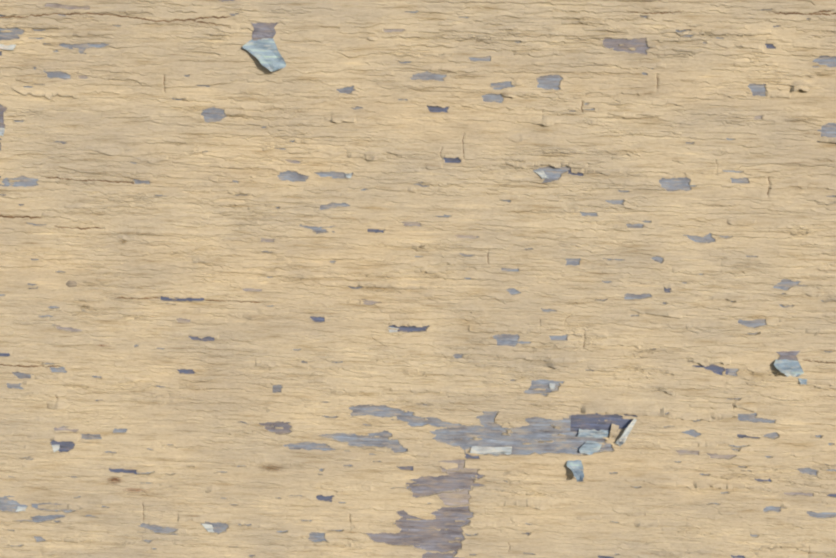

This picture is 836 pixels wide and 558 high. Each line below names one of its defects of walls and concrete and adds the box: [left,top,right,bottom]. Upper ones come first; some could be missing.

peeling [0,28,24,55]
peeling [243,22,308,77]
peeling [603,37,651,55]
peeling [43,70,88,80]
peeling [506,155,588,183]
peeling [2,176,39,187]
peeling [774,350,807,385]
peeling [524,379,564,395]
peeling [259,421,300,434]
peeling [283,430,406,453]
peeling [349,398,665,558]
peeling [308,530,329,542]